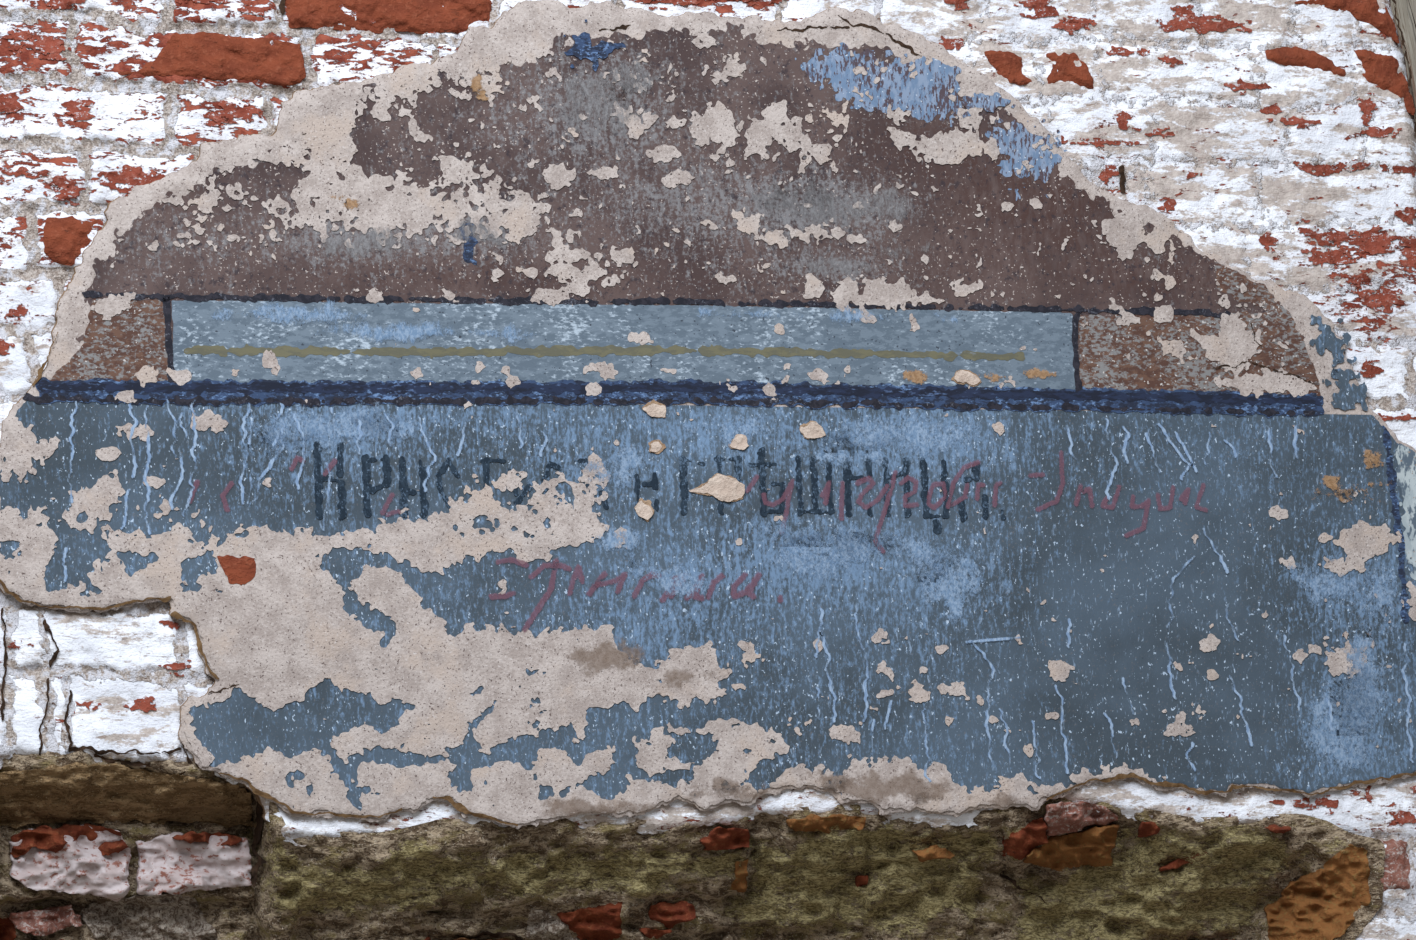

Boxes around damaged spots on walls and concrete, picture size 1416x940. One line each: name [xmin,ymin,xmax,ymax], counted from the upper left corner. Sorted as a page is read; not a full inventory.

peeling [1013,0,1097,36]
peeling [1156,4,1252,34]
peeling [1223,78,1322,128]
peeling [145,33,1187,307]
peeling [1293,161,1416,177]
spalling [1,159,166,266]
peeling [90,292,136,320]
peeling [803,254,1005,332]
peeling [1001,188,1328,401]
peeling [1296,202,1416,313]
peeling [115,365,192,403]
crack [0,579,518,888]